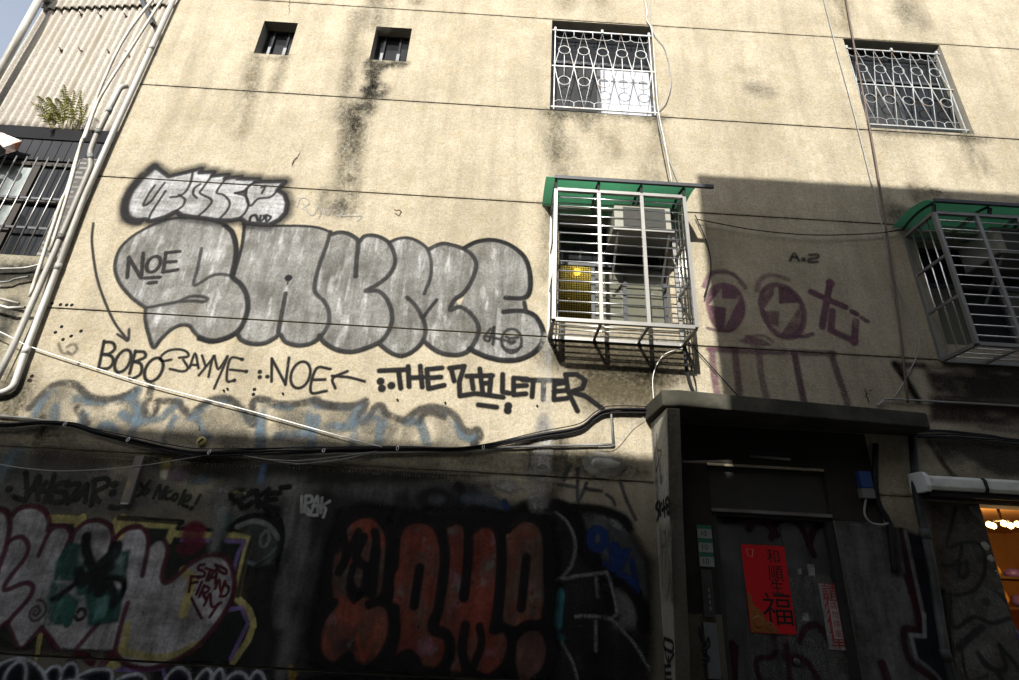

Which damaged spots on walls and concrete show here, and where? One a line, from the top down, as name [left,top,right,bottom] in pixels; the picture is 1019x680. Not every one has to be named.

leakage [342,59,407,158]